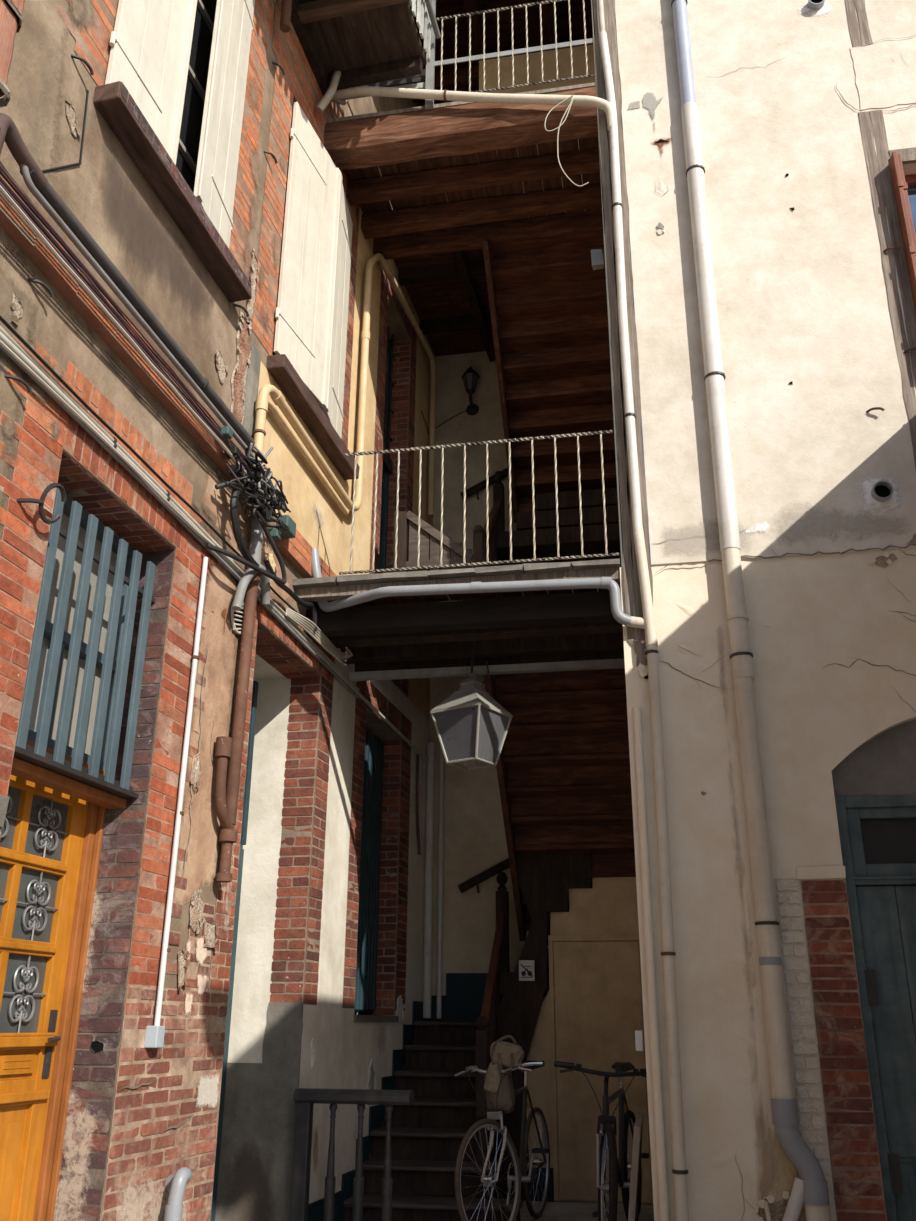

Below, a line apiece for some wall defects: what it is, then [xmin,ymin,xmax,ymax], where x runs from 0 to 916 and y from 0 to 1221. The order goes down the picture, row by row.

flaking render [628,92,663,130]
flaking render [215,248,259,424]
damp [666,525,720,551]
crack [655,529,916,573]
damp [781,508,900,540]
crack [823,658,916,712]
flaking render [178,888,219,1014]